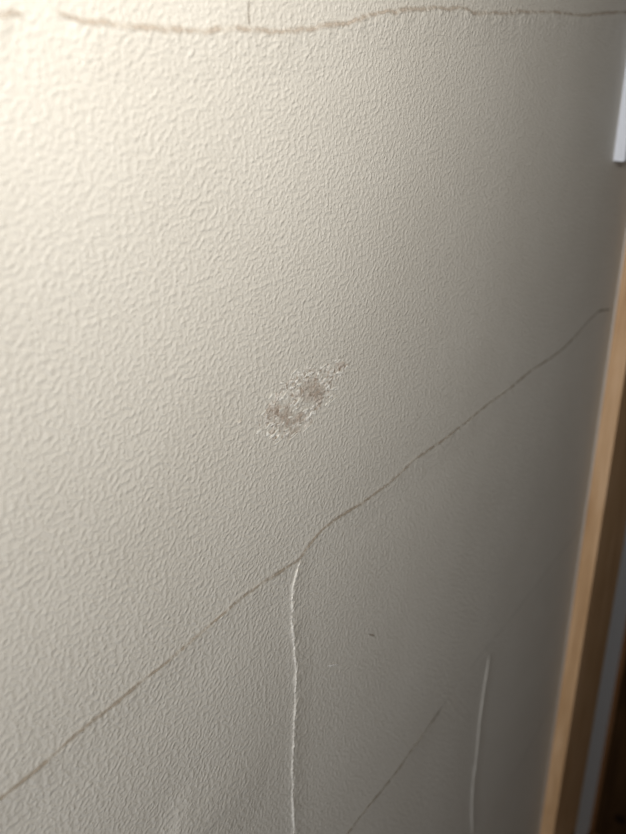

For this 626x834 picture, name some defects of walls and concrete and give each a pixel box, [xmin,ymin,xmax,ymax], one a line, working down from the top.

crack [284,561,313,834]
crack [468,653,495,834]